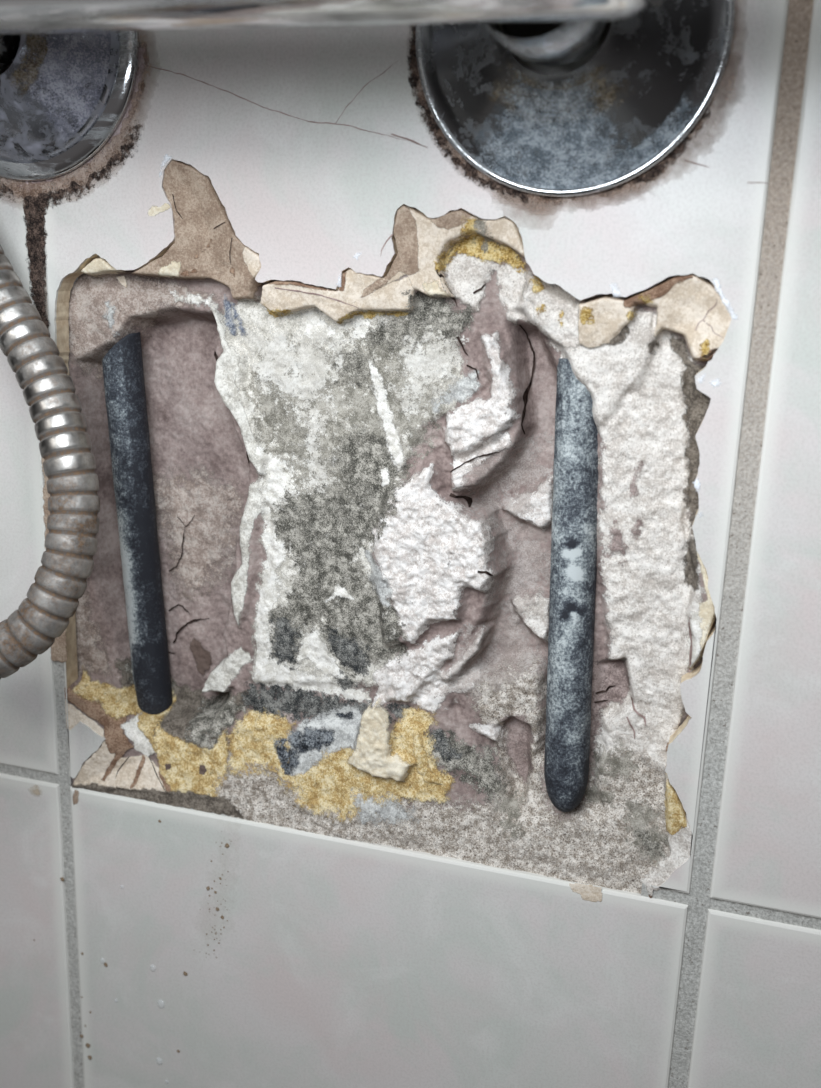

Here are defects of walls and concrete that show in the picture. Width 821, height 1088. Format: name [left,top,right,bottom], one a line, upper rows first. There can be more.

crack [151,60,427,148]
leakage [23,195,49,328]
leakage [41,458,50,549]
leakage [223,292,470,725]
spalling [65,154,738,902]
leakage [51,629,67,663]